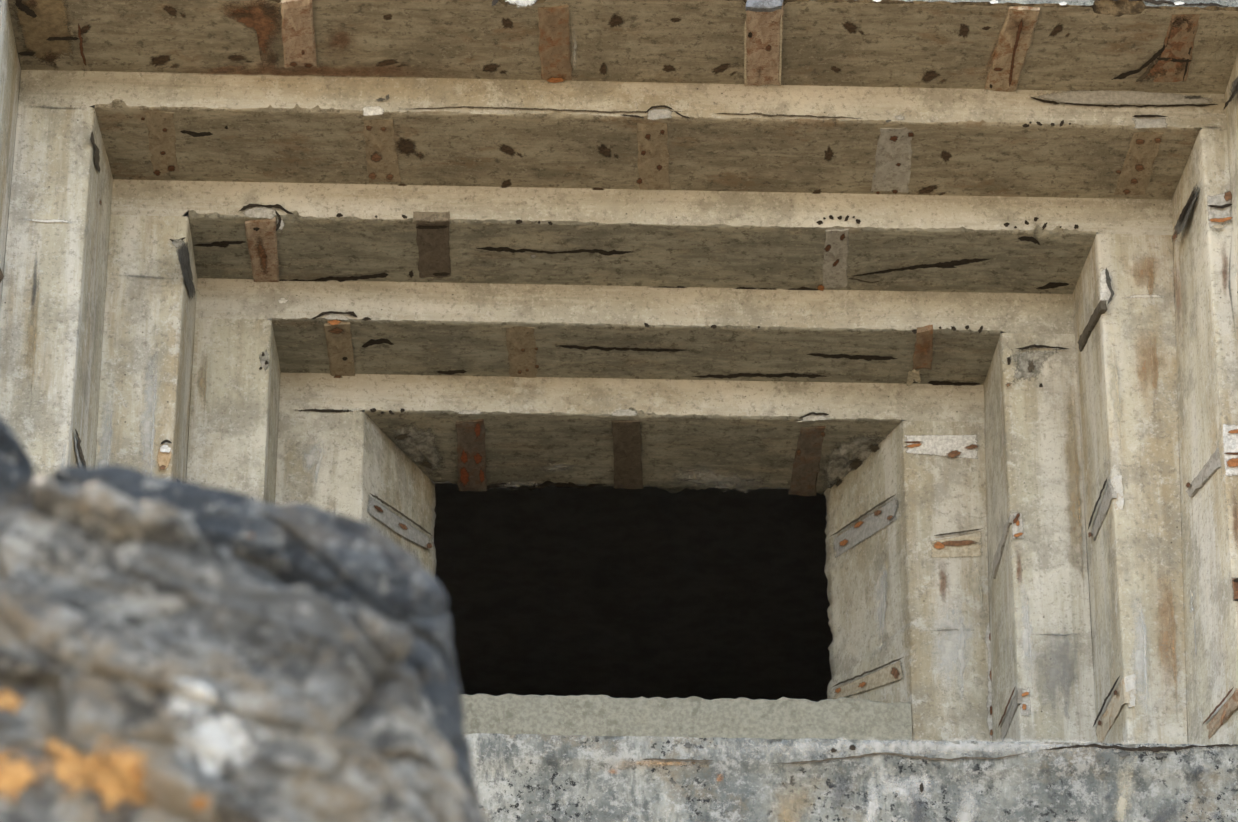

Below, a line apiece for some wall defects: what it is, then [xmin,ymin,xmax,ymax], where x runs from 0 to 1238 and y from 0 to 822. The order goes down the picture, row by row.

crack [1018,236,1040,245]
crack [476,247,632,258]
crack [735,258,993,291]
crack [1036,282,1069,290]